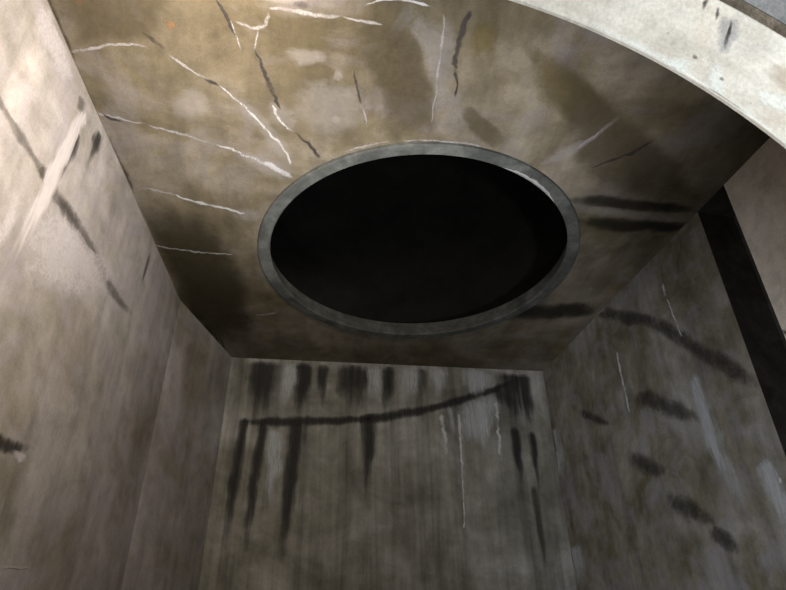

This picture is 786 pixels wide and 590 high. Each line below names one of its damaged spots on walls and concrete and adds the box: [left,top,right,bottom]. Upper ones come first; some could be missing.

crack [98,113,130,122]
crack [88,36,154,50]
crack [174,0,319,176]
crack [433,12,471,104]
damp [21,112,108,292]
crack [151,189,243,214]
crack [159,245,230,255]
damp [250,362,328,407]
damp [517,304,745,380]
damp [228,419,248,510]
damp [246,424,302,537]
damp [458,372,532,527]